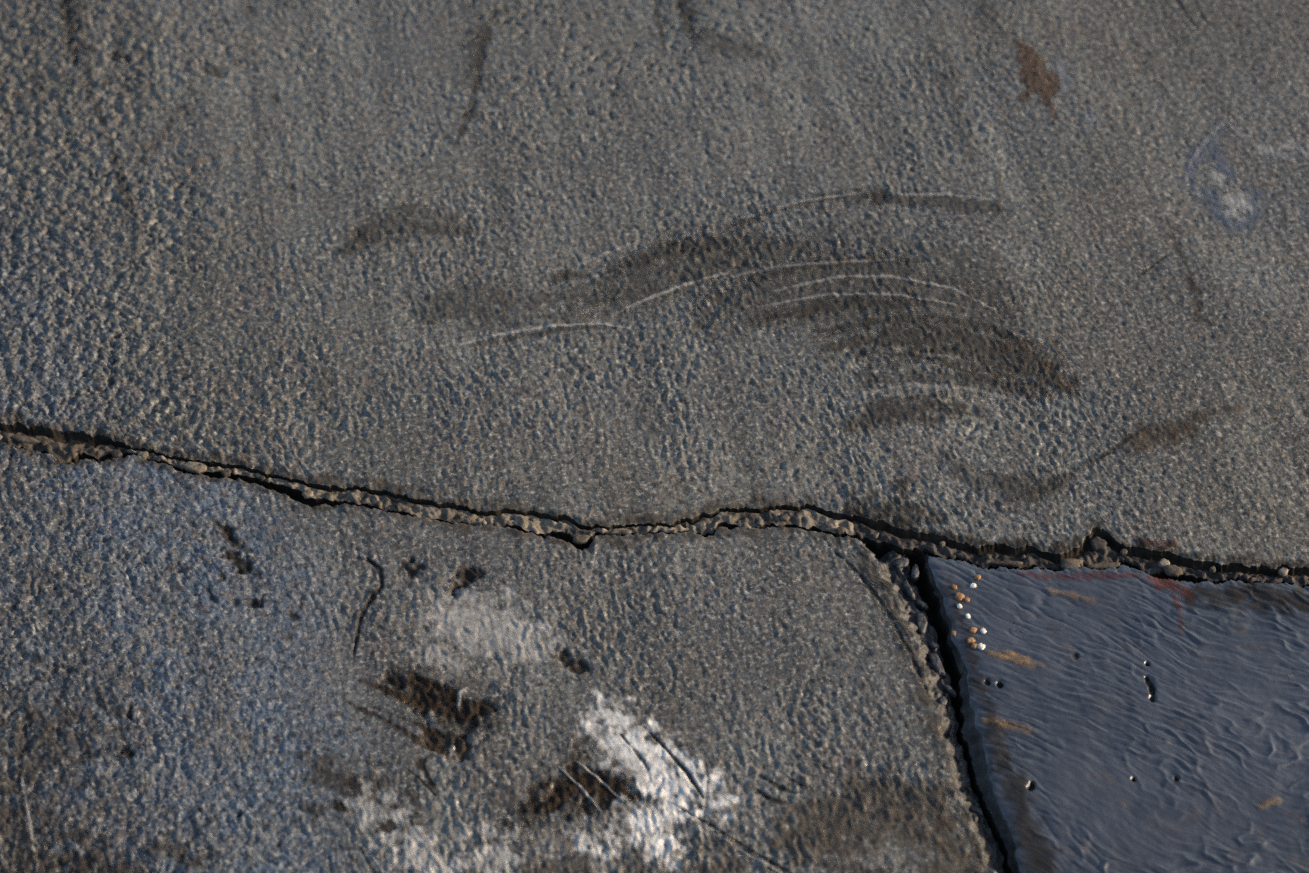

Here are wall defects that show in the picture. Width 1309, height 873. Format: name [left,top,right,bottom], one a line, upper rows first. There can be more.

corrosion [1016,40,1072,118]
crack [0,422,1309,873]